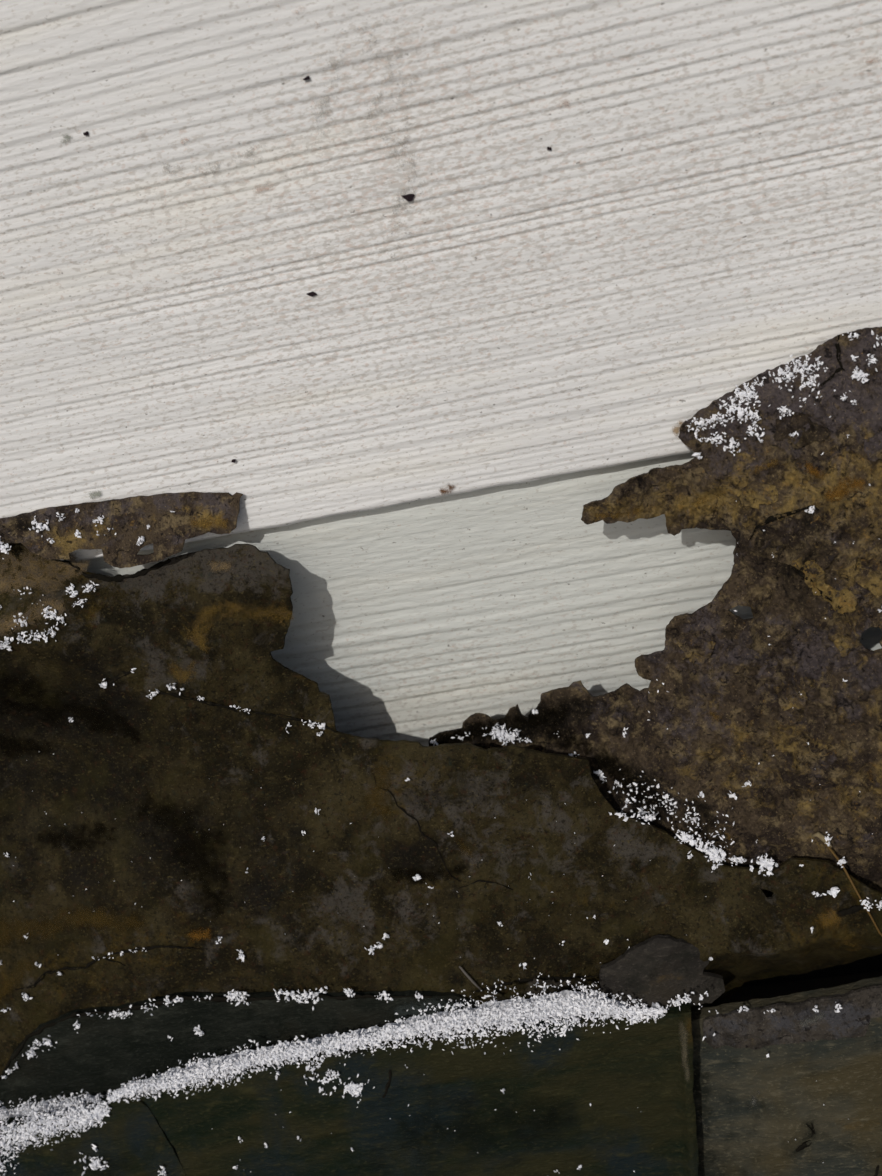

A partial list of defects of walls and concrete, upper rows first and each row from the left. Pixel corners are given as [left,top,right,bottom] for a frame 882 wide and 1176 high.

corrosion [0,549,88,636]
corrosion [172,602,293,684]
corrosion [429,327,882,893]
crack [15,946,207,990]
crack [0,994,432,1080]
water stain [395,999,468,1017]